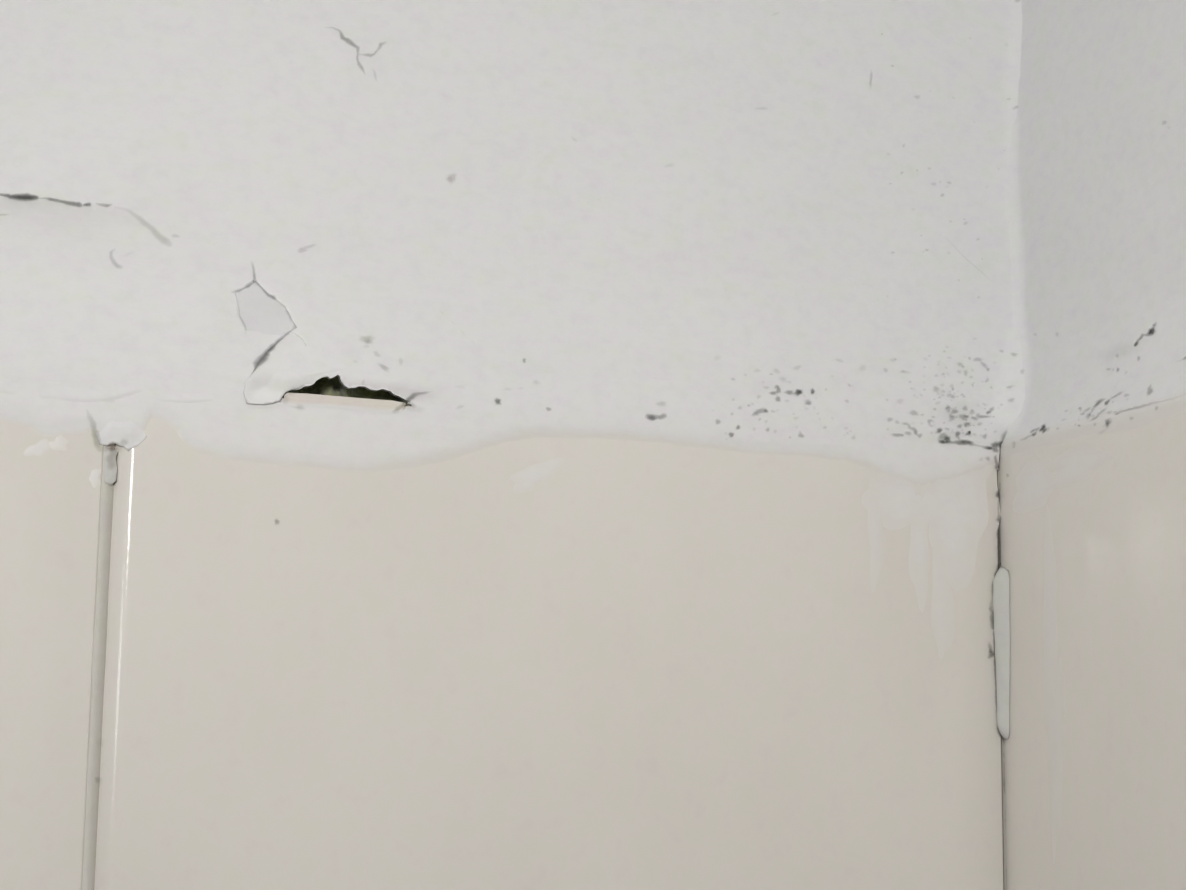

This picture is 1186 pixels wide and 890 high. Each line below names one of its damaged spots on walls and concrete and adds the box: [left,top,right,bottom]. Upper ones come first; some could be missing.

crack [9,193,36,201]
flaking render [208,281,481,414]